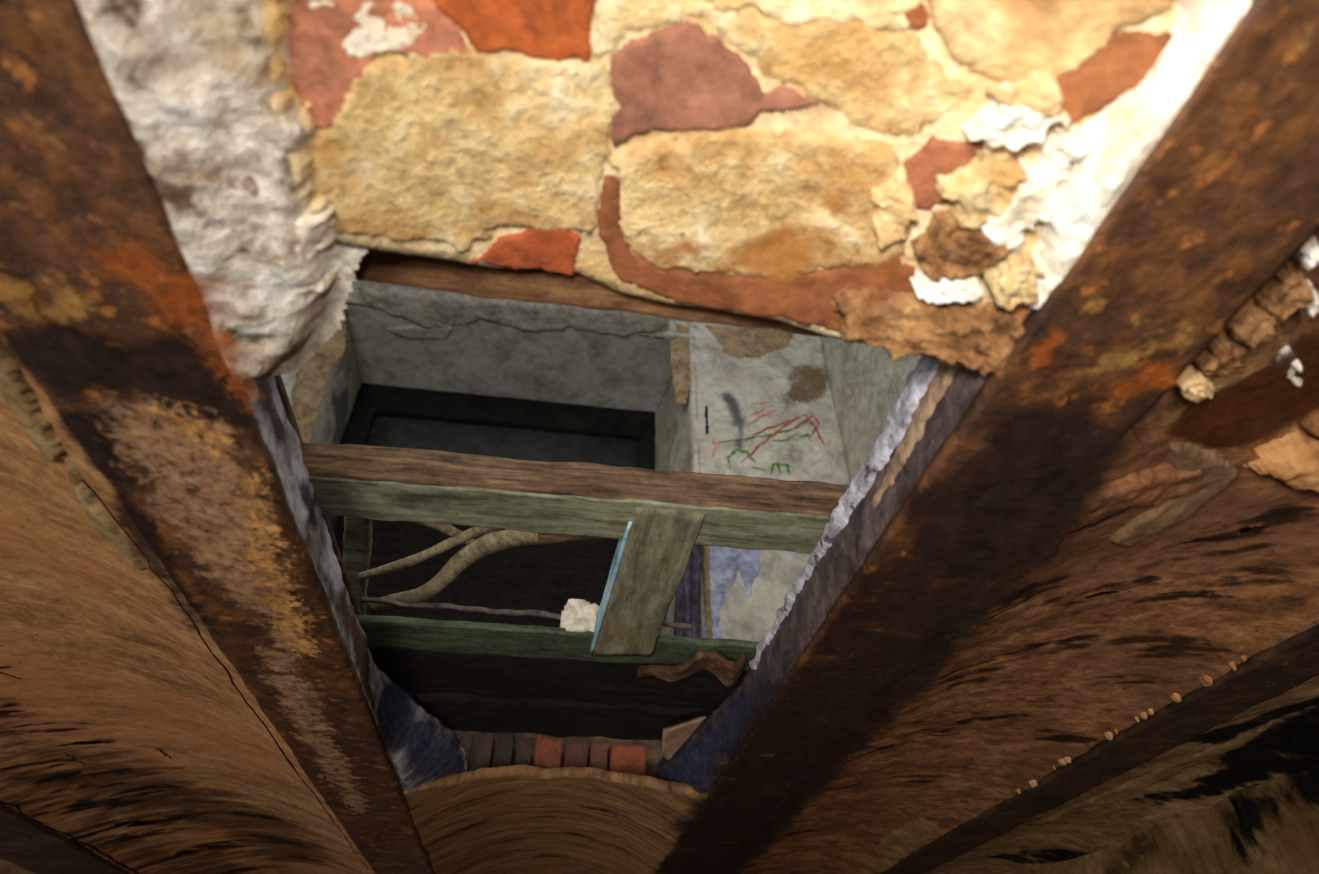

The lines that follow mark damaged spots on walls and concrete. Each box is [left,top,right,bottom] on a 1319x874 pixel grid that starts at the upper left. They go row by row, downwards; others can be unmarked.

rust [0,274,95,324]
rust [98,246,210,324]
rust [1093,322,1192,397]
flaking render [1075,408,1319,546]